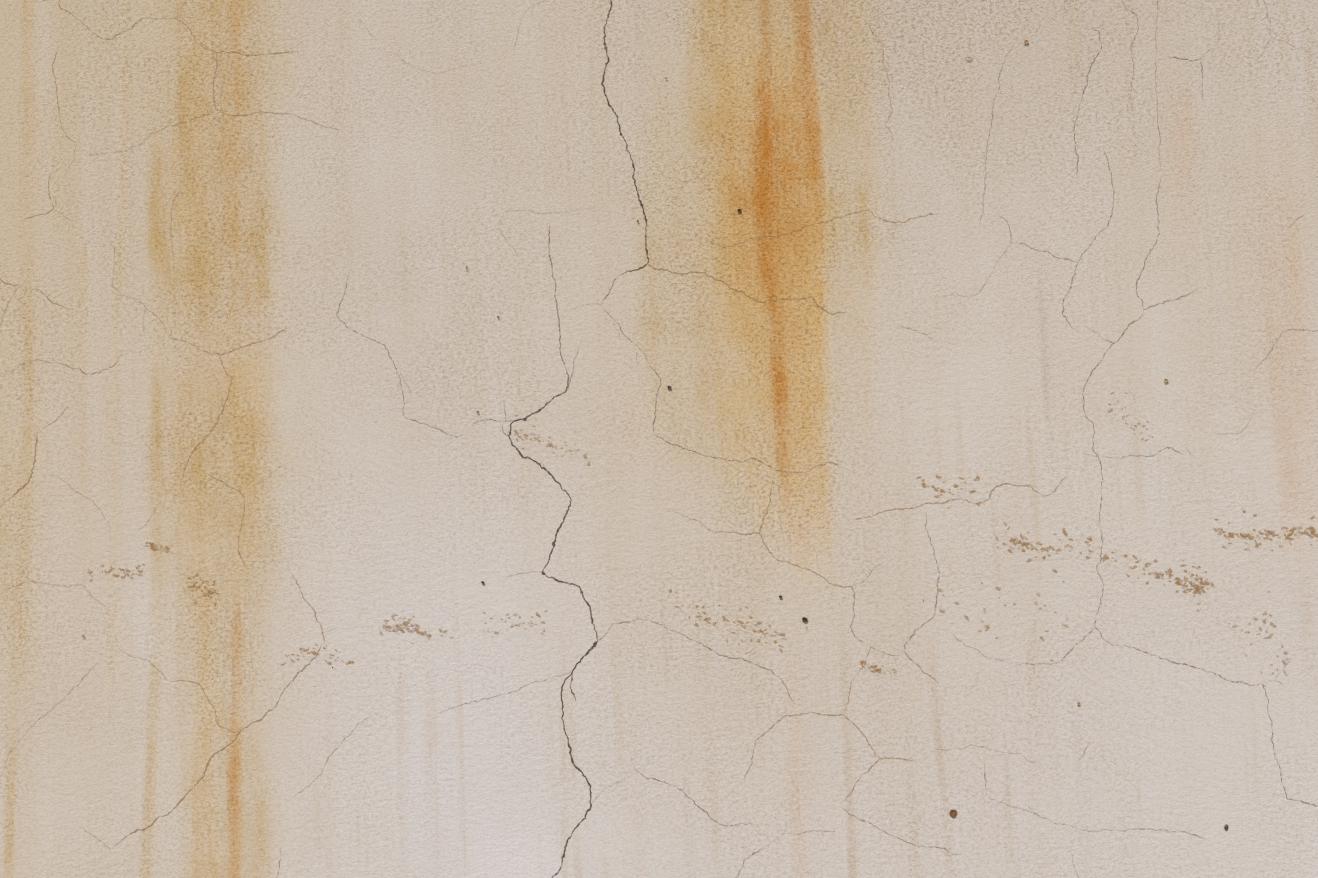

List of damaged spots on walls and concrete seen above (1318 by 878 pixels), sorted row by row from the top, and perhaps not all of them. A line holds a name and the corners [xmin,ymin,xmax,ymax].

crack [11,421,55,498]
crack [109,581,324,849]
rust [92,0,350,878]
crack [477,231,658,877]
crack [601,0,840,453]
rust [646,0,874,669]
crack [729,457,939,676]
crack [744,712,947,850]